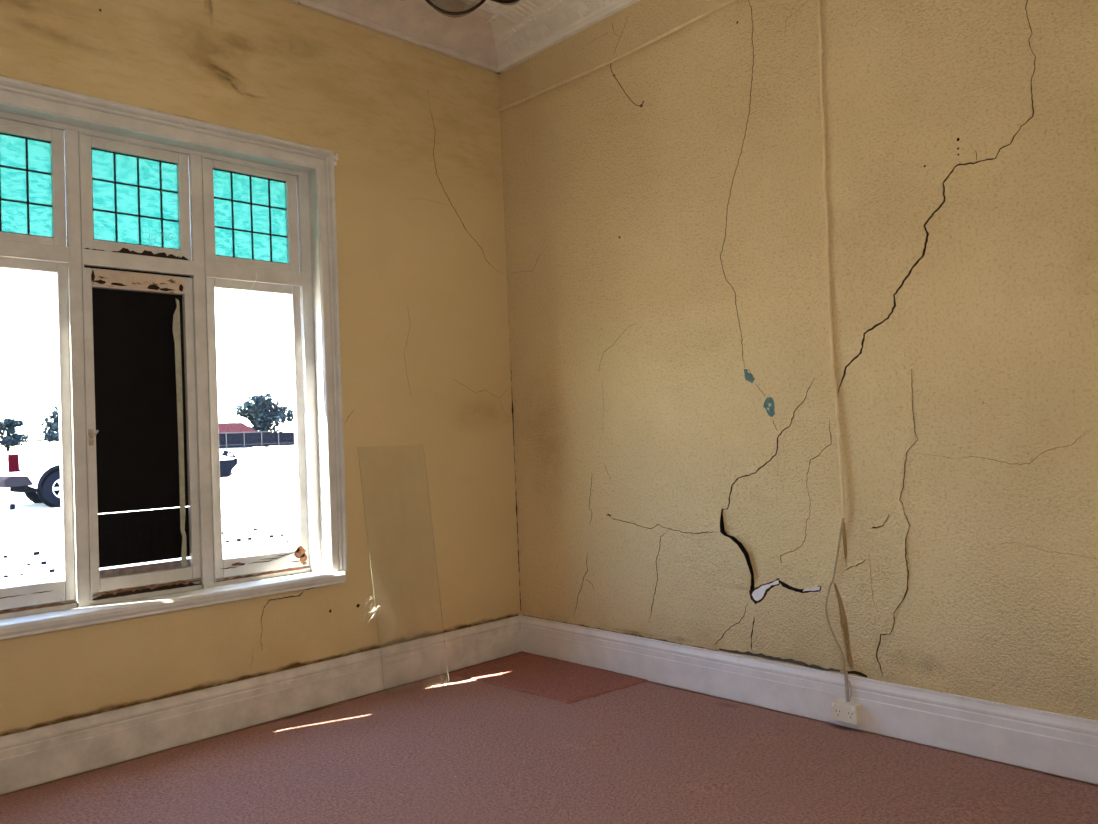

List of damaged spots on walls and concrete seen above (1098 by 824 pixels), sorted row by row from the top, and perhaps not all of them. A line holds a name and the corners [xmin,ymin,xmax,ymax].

crack [425,91,541,312]
crack [589,0,1036,623]
crack [453,358,521,611]
crack [712,602,755,650]
flaking render [749,577,821,604]
crack [844,368,1093,677]